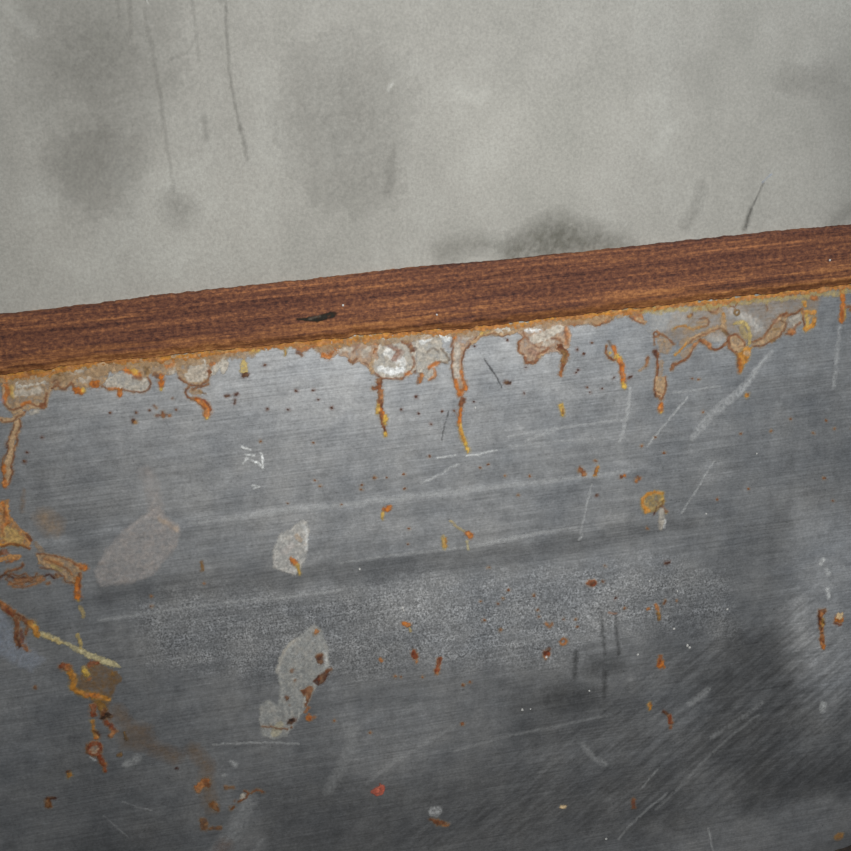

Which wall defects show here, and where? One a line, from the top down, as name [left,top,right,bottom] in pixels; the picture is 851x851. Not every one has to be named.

corrosion [0,284,851,488]
corrosion [0,500,88,601]
corrosion [641,490,668,529]
corrosion [0,600,40,651]
corrosion [817,608,844,650]
corrosion [59,661,127,772]